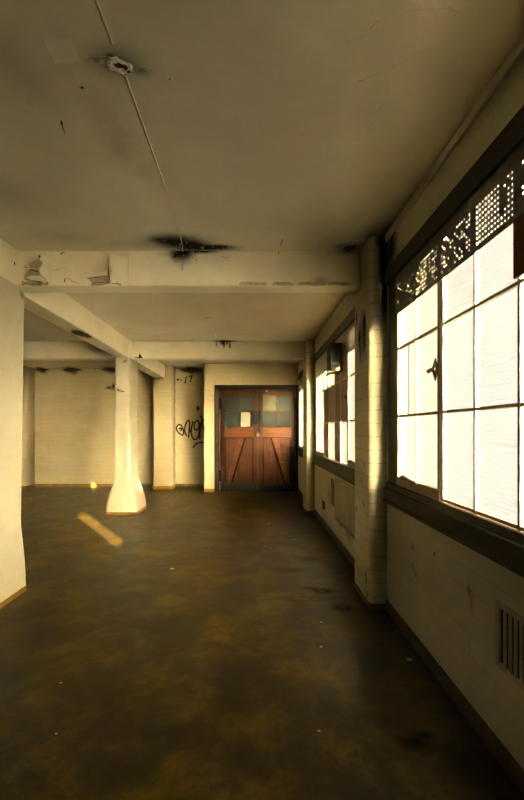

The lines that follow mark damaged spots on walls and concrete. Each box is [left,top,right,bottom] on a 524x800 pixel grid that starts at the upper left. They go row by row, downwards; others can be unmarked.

spalling [92,56,133,74]
peeling [14,255,50,286]
peeling [87,254,129,286]